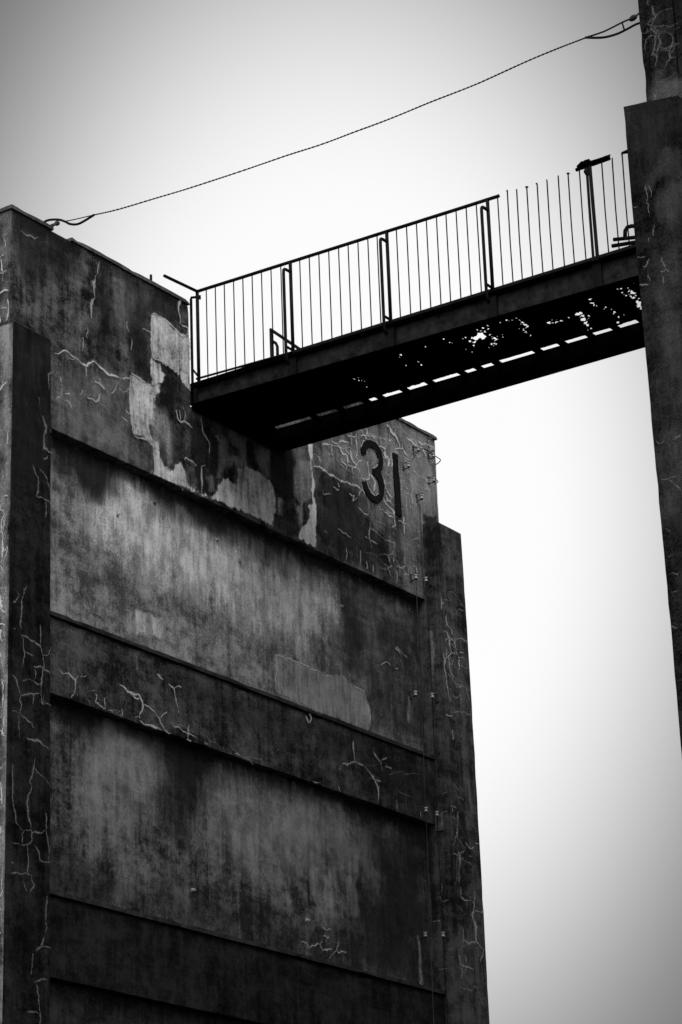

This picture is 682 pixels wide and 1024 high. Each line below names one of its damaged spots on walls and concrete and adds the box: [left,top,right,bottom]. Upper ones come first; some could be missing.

crack [56,350,131,421]
peeling [129,313,276,525]
peeling [299,444,317,547]
crack [314,425,434,534]
crack [62,673,206,744]
peeling [274,654,371,730]
crack [344,741,380,799]
leakage [50,700,434,986]